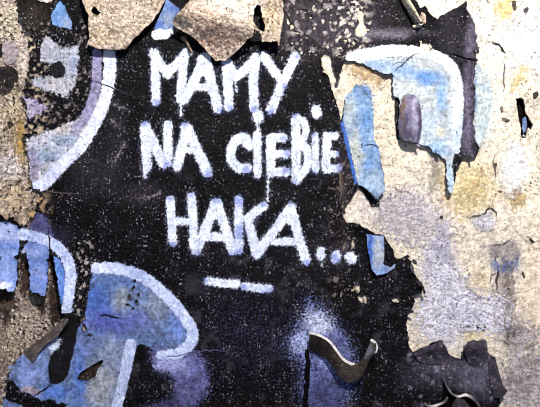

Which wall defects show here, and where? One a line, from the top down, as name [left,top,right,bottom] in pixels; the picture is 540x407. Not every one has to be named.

peeling [82,0,165,50]
peeling [172,0,284,61]
flaking render [0,0,43,226]
flaking render [321,0,540,407]
flaking render [0,248,70,407]
peeling [308,332,378,383]